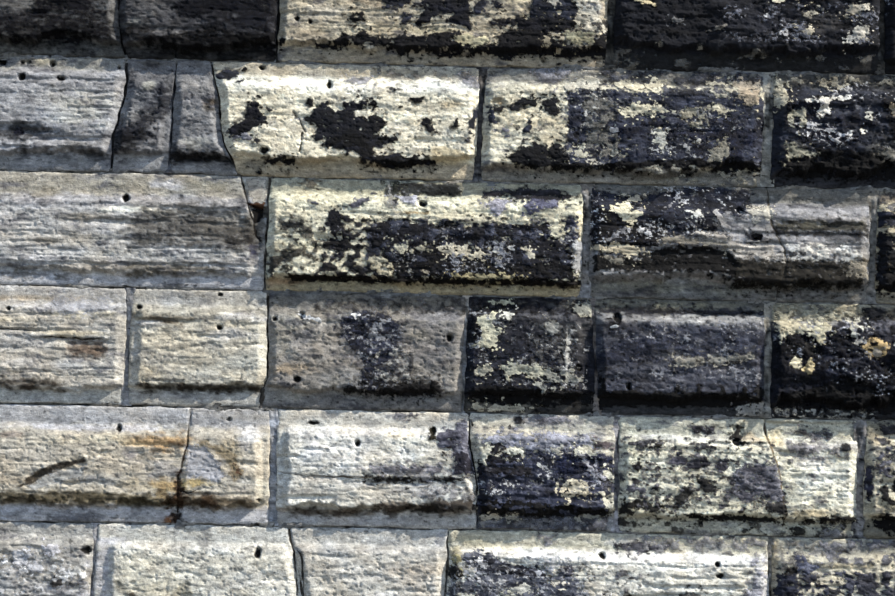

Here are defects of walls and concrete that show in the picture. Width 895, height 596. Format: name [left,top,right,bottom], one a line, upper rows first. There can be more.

peeling [213,64,251,82]
peeling [223,92,298,223]
crack [241,176,264,243]
crack [171,409,197,517]
corrosion [152,469,217,523]
crack [288,529,304,596]